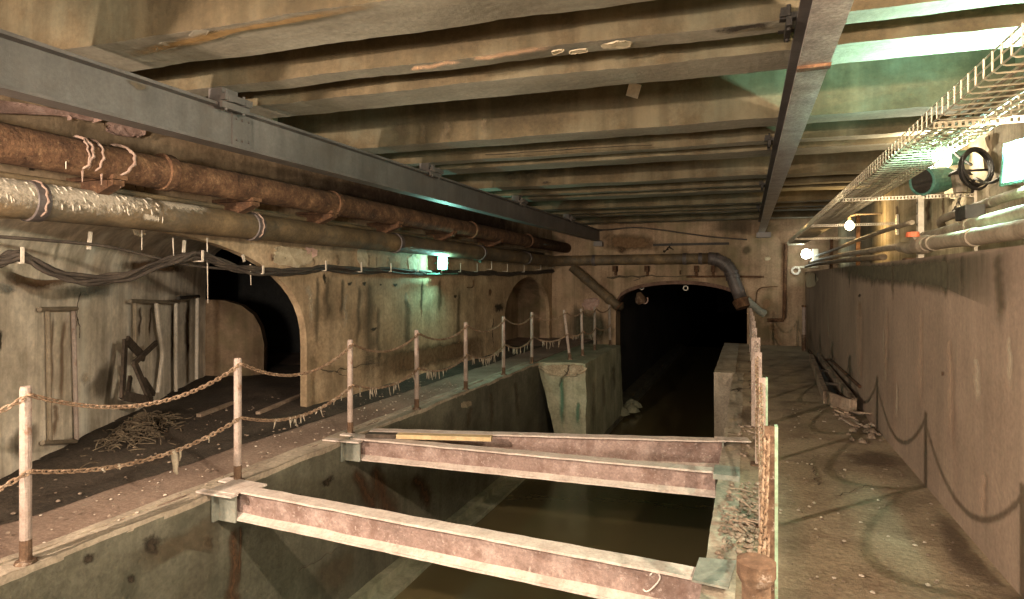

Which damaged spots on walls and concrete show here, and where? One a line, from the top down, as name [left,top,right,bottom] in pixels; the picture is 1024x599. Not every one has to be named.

rust [477,49,534,59]
peeling [600,40,632,49]
damp [839,256,982,295]
damp [315,278,343,334]
damp [357,282,475,374]